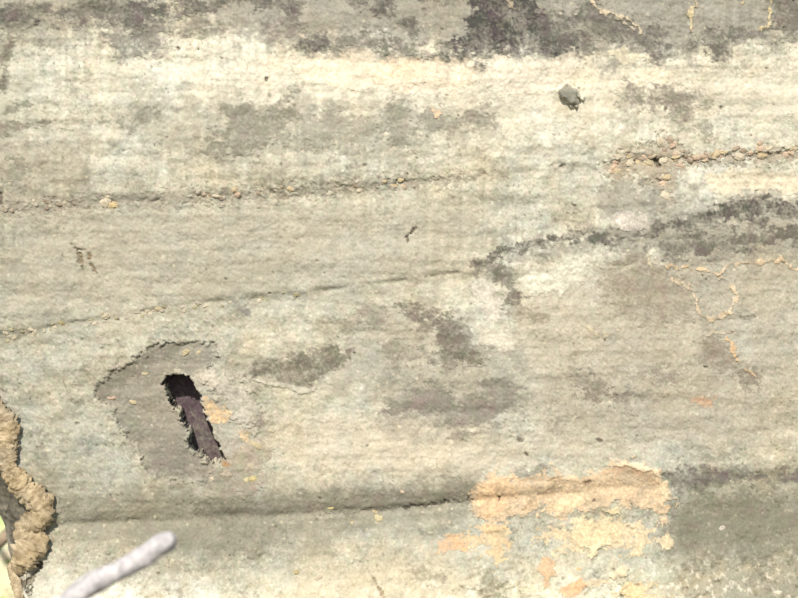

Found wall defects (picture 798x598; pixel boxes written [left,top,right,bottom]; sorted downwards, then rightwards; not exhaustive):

damp [0,0,798,147]
damp [195,81,503,166]
damp [0,152,39,188]
damp [322,190,798,445]
damp [239,344,356,394]
spalling [85,330,284,511]
flaking render [656,529,674,552]